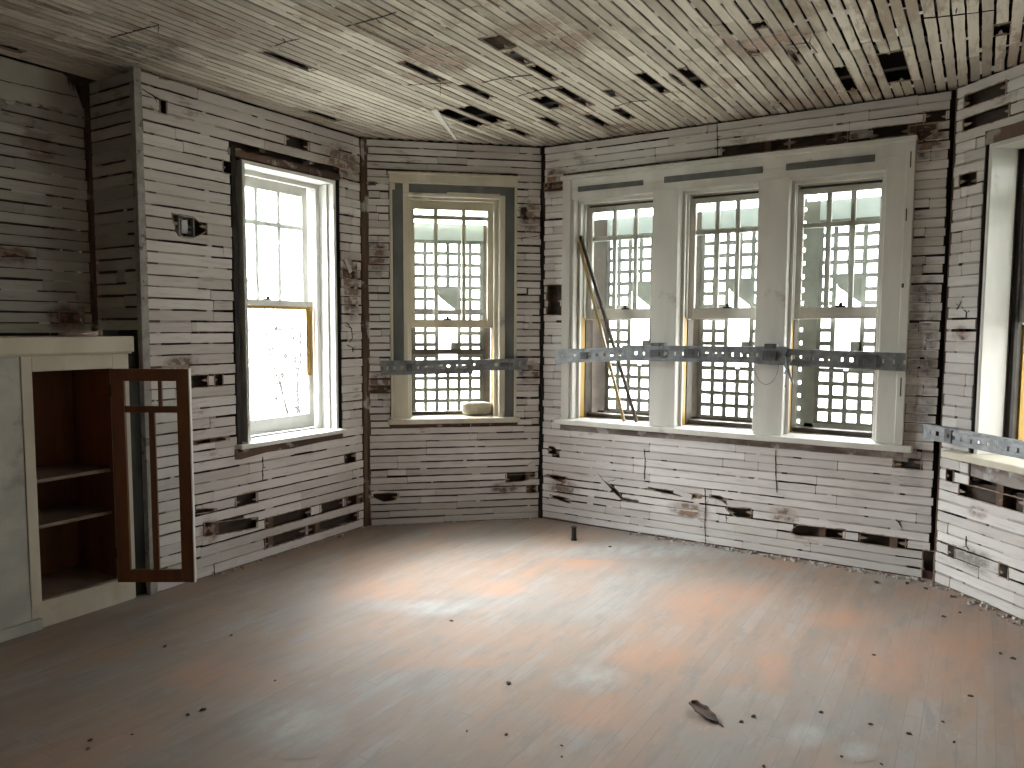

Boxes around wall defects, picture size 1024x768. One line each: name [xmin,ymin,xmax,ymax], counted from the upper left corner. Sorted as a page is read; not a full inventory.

spalling [350,22,533,137]
spalling [478,23,637,127]
spalling [958,170,984,188]
spalling [195,489,400,550]
spalling [502,472,576,504]
spalling [604,483,754,519]
crack [702,488,728,543]
spalling [945,468,1024,514]
spalling [789,523,968,581]